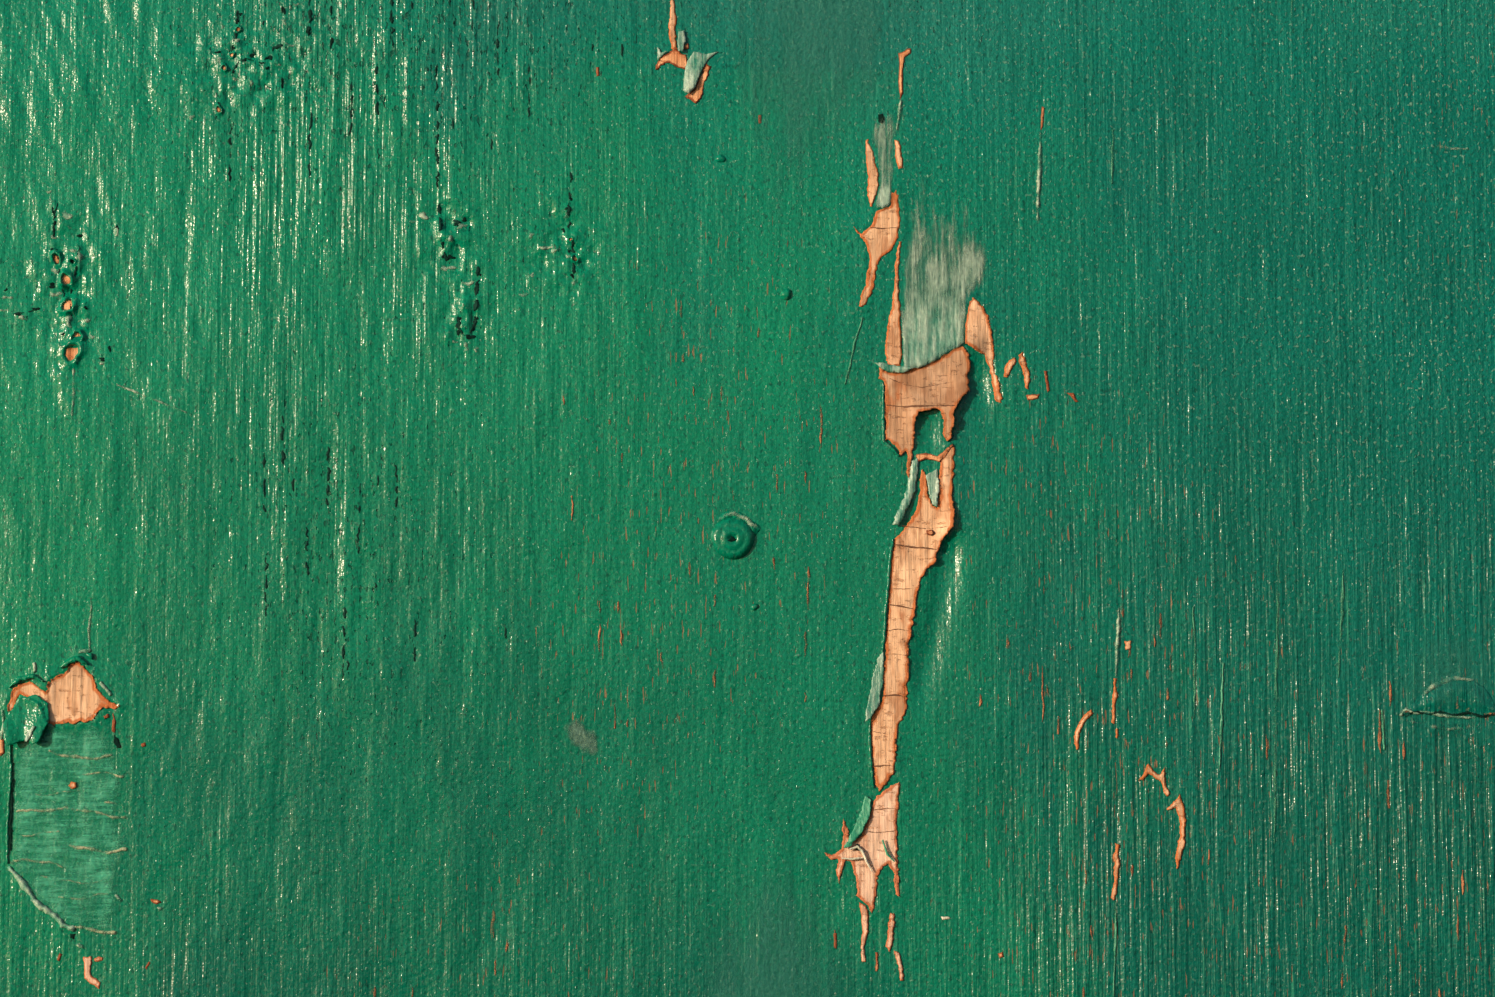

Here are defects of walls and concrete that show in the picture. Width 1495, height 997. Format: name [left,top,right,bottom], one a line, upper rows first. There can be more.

peeling [656,0,717,104]
peeling [825,126,1079,981]
peeling [1074,710,1093,750]
peeling [0,648,126,989]
peeling [1139,764,1186,869]